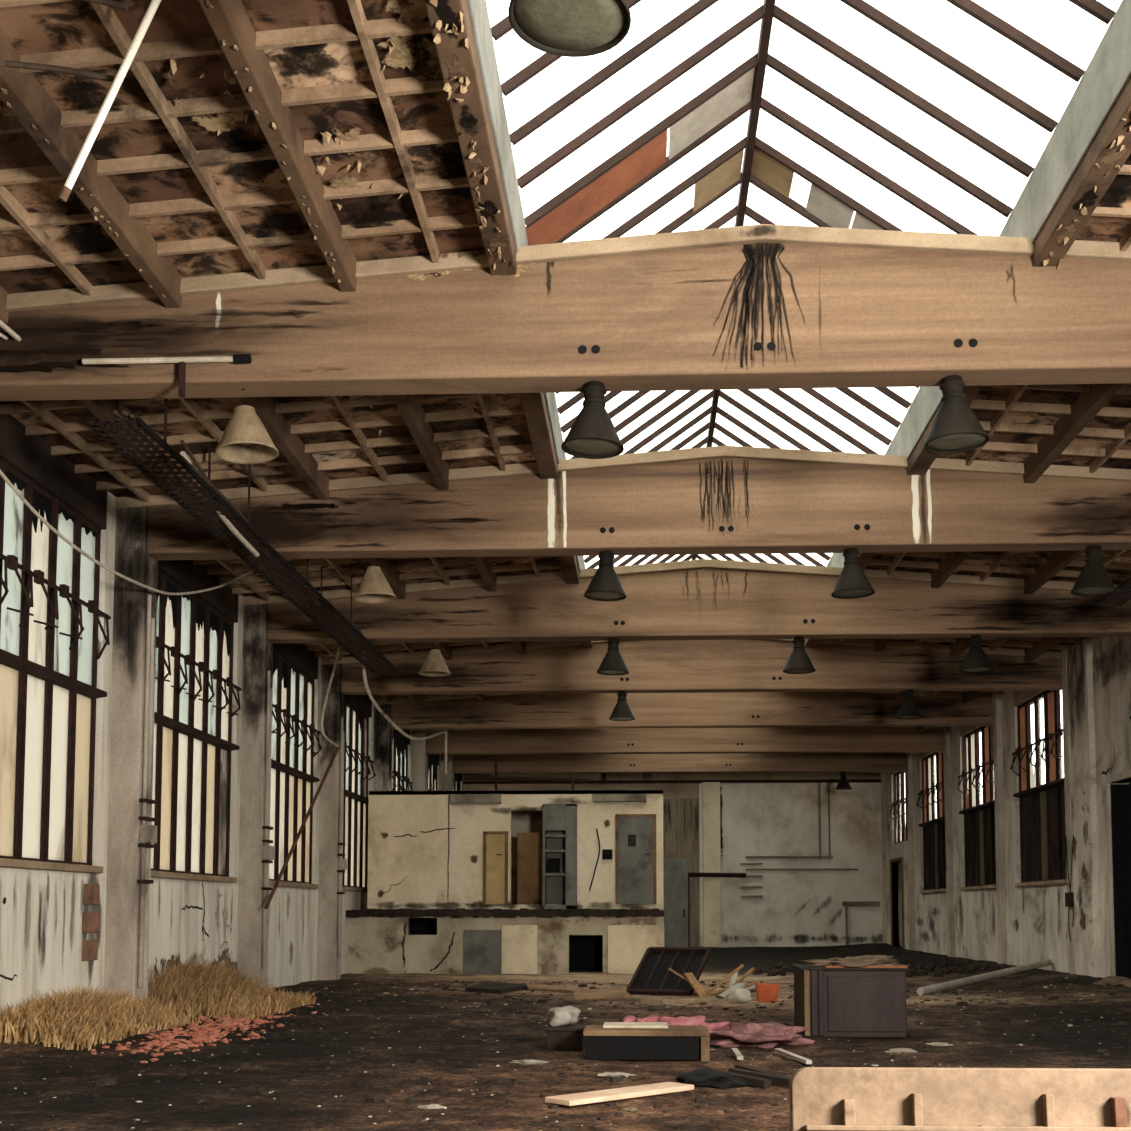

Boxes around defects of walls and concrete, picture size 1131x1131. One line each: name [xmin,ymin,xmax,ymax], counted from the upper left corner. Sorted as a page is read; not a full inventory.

peeling [378,0,535,281]
peeling [1043,107,1131,270]
leakage [14,877,84,960]